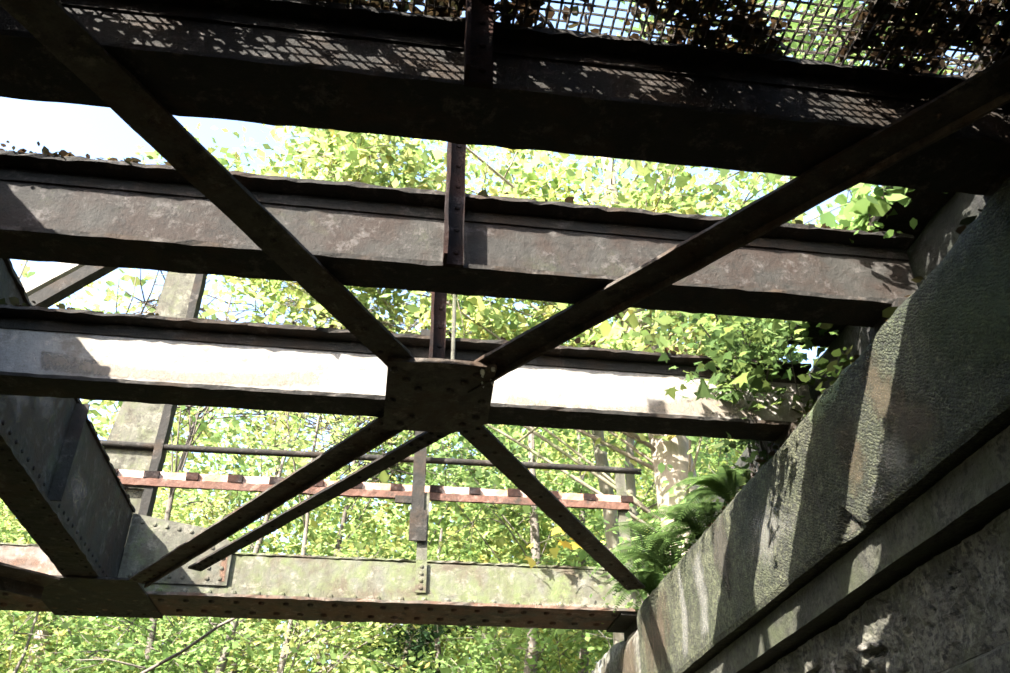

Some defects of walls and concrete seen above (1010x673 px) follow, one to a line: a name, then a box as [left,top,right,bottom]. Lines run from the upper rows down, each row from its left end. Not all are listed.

spalling [849,514,863,535]
spalling [848,642,898,673]